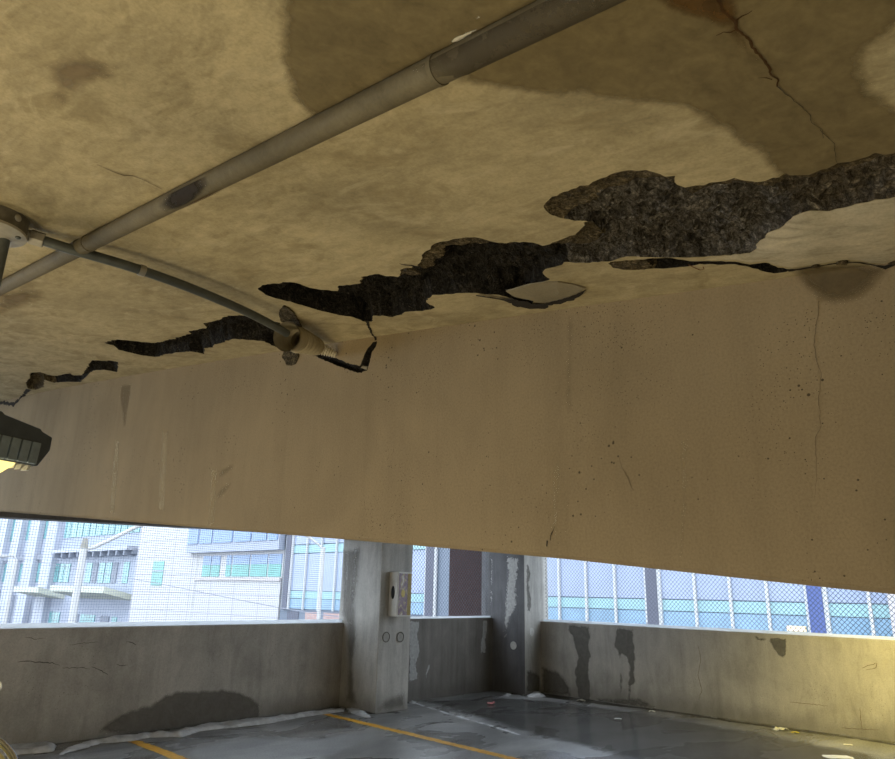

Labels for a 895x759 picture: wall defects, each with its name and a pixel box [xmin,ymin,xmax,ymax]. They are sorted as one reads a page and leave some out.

water stain [283,0,895,175]
crack [716,0,837,162]
spalling [105,153,895,366]
water stain [799,267,878,298]
crack [0,360,118,407]
crack [315,342,377,373]
water stain [503,557,531,637]
water stain [104,691,258,733]
water stain [527,626,895,745]